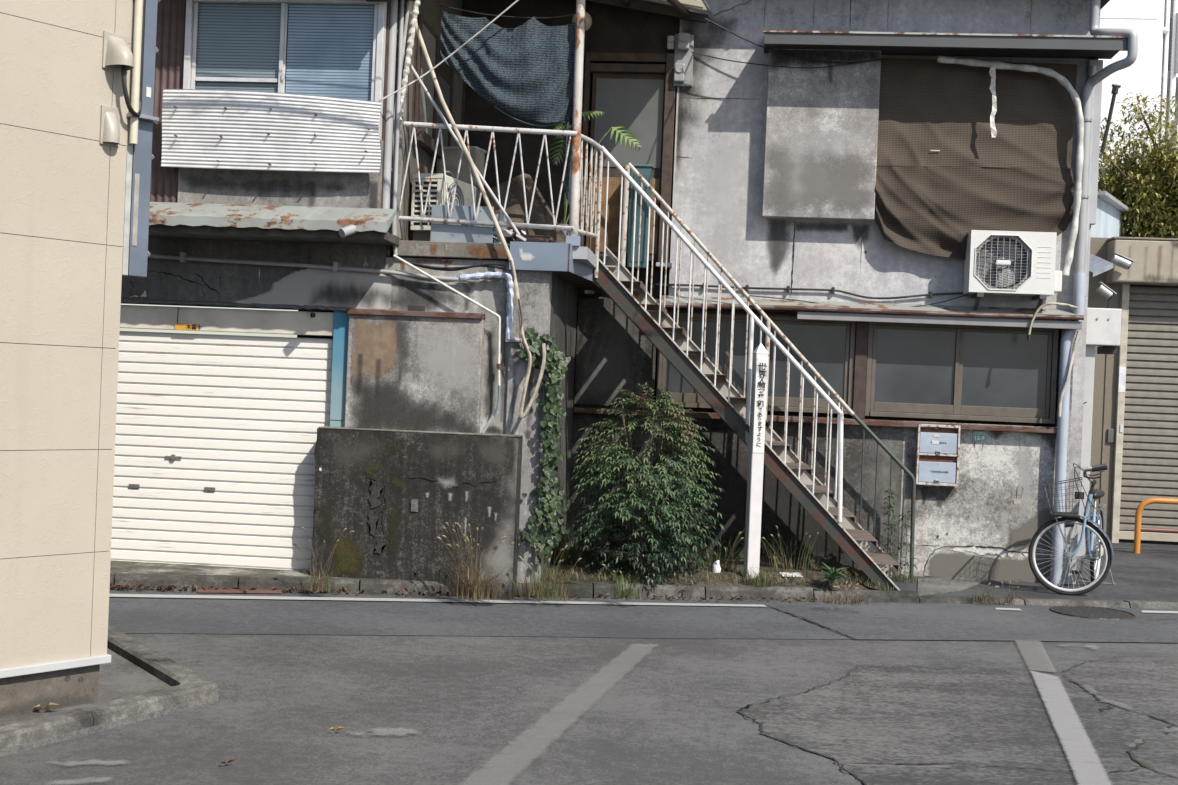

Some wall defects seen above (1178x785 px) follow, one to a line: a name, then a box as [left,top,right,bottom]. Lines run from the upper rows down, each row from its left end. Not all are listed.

leakage [769,133,869,271]
leakage [320,279,470,309]
leakage [334,318,541,497]
leakage [483,521,530,583]
crack [736,606,1176,785]